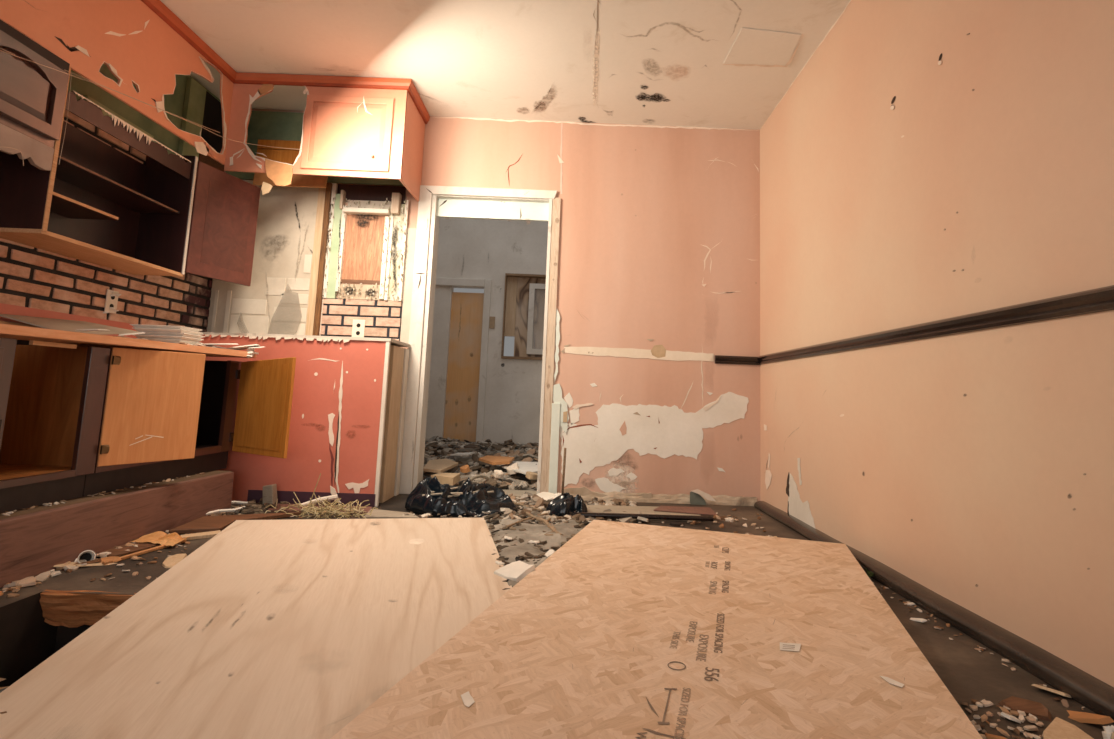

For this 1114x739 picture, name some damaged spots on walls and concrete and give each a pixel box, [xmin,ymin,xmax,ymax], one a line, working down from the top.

crack [55,36,91,57]
crack [592,0,600,103]
water stain [637,86,669,106]
peeling [322,194,408,299]
flaking render [553,310,749,497]
peeling [345,479,369,493]
peeling [786,458,816,529]